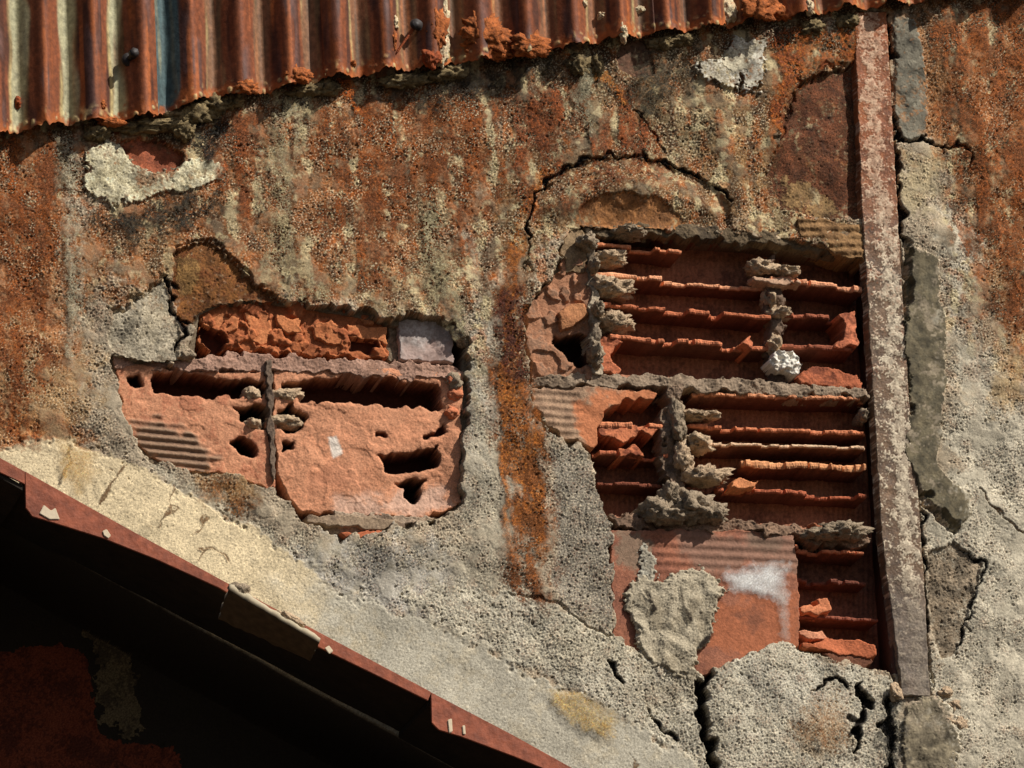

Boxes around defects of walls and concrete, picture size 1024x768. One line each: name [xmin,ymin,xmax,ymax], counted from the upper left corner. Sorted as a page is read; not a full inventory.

rust [421,0,552,71]
rust [723,0,859,148]
crack [524,110,733,248]
rust [929,0,1024,350]
rust [0,135,77,446]
spalling [107,242,470,540]
rust [310,71,673,605]
spalling [524,62,880,679]
efflorescence [727,566,784,600]
crack [920,512,930,633]
crack [956,551,988,650]
crack [812,675,895,768]